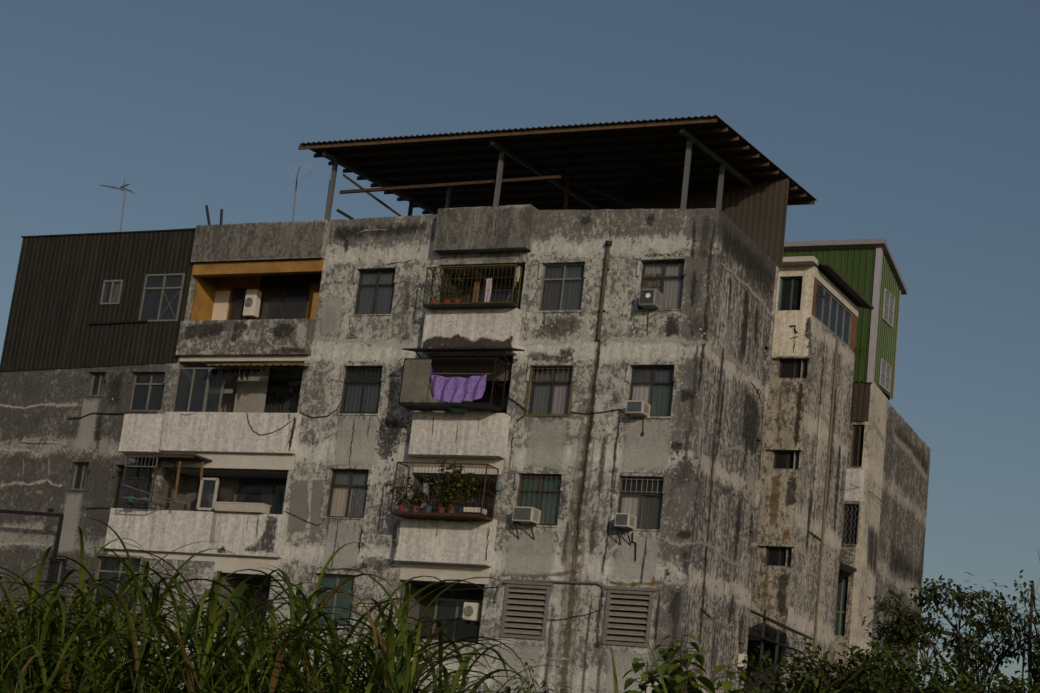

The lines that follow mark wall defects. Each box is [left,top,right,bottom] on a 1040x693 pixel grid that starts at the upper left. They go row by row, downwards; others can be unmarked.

leakage [334,223,427,252]
leakage [184,321,250,342]
leakage [266,279,513,368]
leakage [0,441,66,487]
leakage [525,217,774,693]
leakage [245,516,278,552]